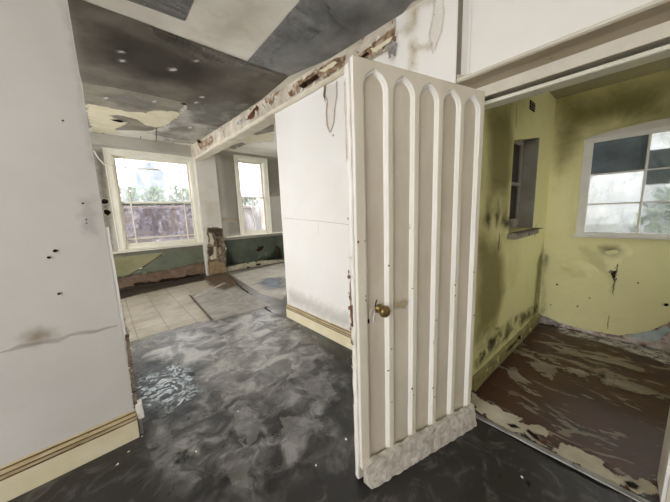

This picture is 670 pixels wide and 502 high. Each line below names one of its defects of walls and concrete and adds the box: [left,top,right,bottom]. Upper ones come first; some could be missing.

peeling [358,25,398,59]
peeling [265,56,345,105]
peeling [85,104,180,134]
flaking render [197,135,212,150]
peeling [237,105,259,125]
peeling [223,124,275,151]
flaking render [114,225,285,289]
leakage [479,242,501,332]
leakage [476,325,512,363]
peeling [471,314,670,496]